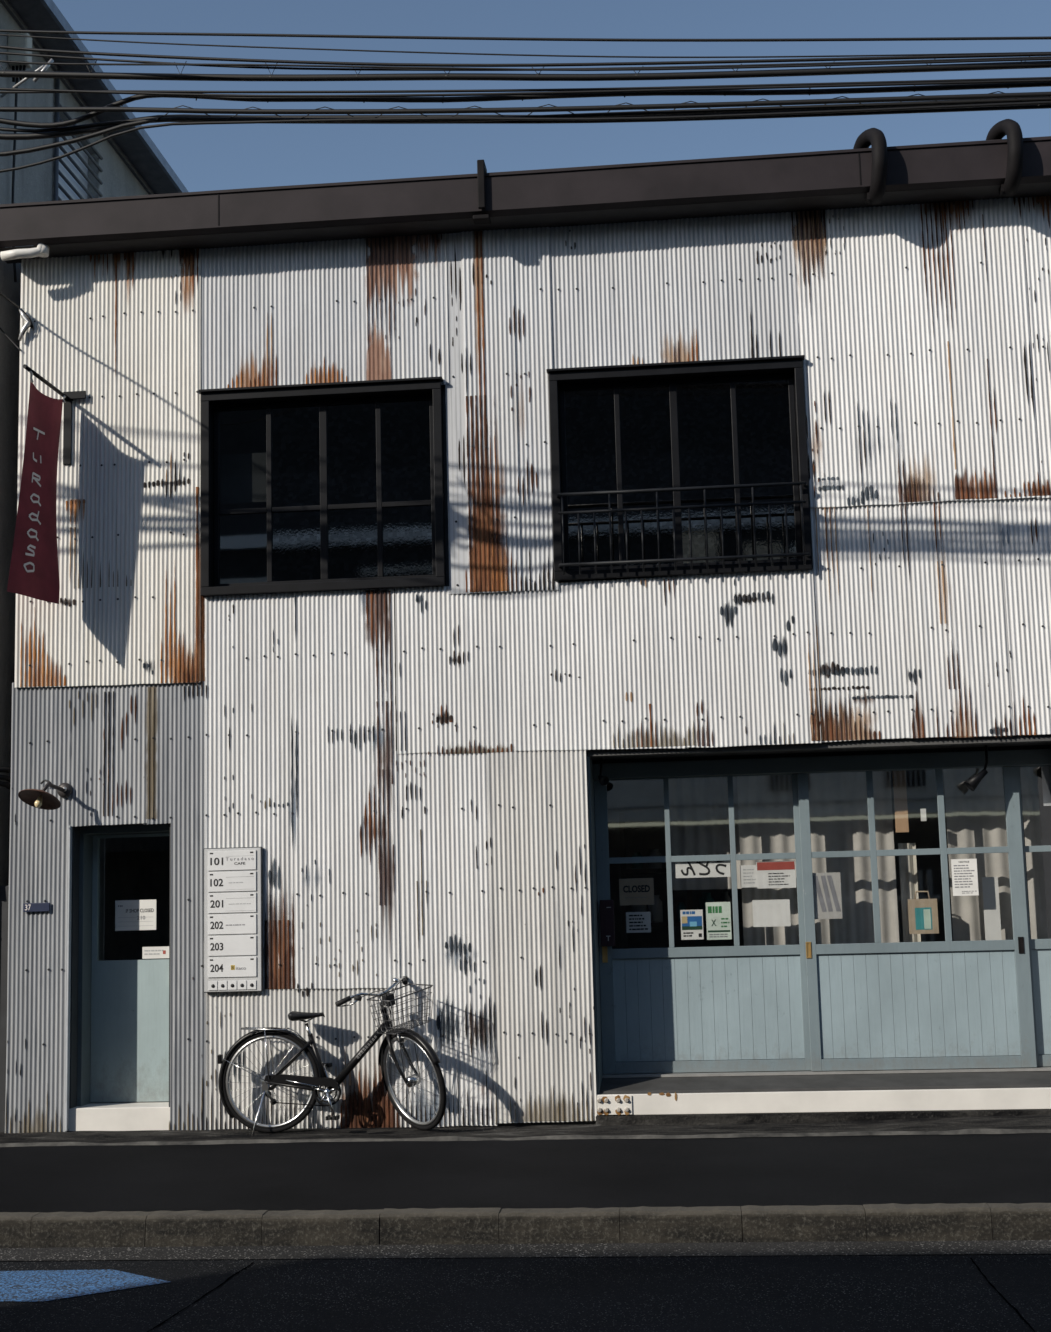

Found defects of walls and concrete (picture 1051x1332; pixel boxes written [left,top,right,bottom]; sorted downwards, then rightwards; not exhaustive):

rust [227,315,277,388]
rust [365,233,442,380]
rust [458,231,509,592]
rust [791,210,826,310]
rust [898,196,1051,577]
rust [20,622,66,687]
rust [160,487,205,696]
rust [808,626,881,741]
rust [360,589,395,934]
rust [264,860,295,989]
rust [335,1058,399,1128]
crack [147,1262,254,1332]